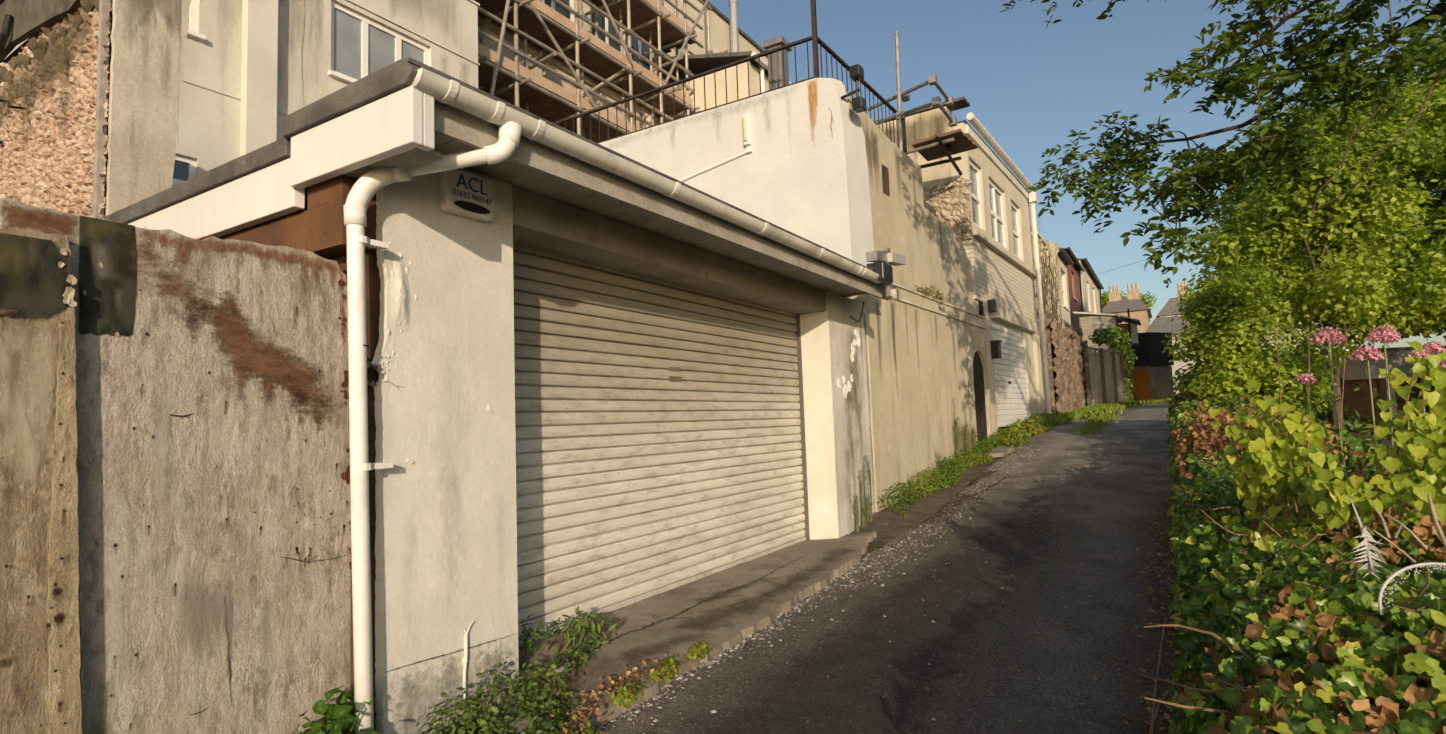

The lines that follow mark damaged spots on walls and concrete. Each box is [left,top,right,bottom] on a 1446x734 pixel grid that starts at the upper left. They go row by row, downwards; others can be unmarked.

corrosion [809,81,817,125]
water stain [2,202,77,242]
corrosion [131,231,339,430]